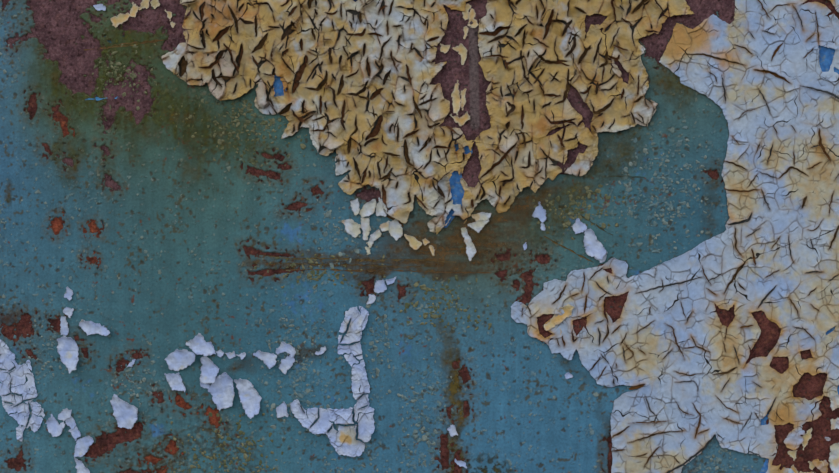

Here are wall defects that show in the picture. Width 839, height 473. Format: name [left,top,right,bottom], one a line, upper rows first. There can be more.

rust [4,0,200,161]
crack [181,0,665,227]
peeling [161,0,694,288]
rust [313,167,601,304]
peeling [511,0,839,473]
crack [553,0,839,473]
peeling [0,286,94,473]
peeling [79,319,110,336]
rust [84,417,145,462]
peeling [386,352,458,472]
rust [746,305,789,374]
rust [766,365,839,473]